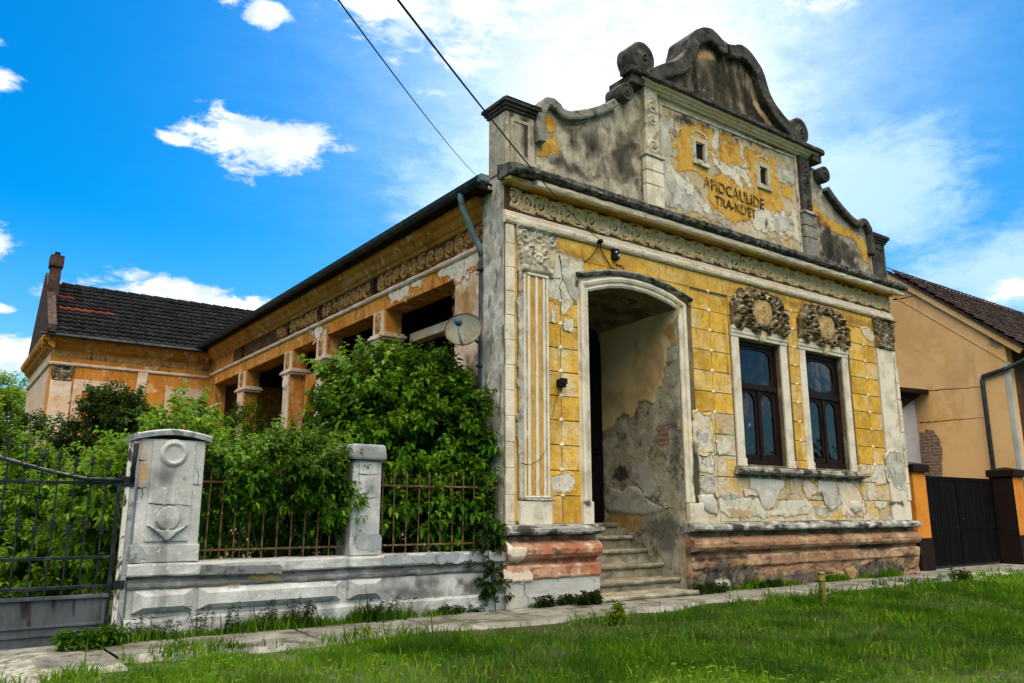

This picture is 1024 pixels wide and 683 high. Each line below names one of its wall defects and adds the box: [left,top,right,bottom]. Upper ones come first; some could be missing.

damp [571,131,597,155]
damp [612,134,636,178]
flaking render [658,114,734,230]
peeling [708,122,754,192]
peeling [438,244,479,285]
flaking render [747,206,803,244]
damp [817,218,858,269]
peeling [387,277,425,307]
peeling [550,471,578,500]
flaking render [692,409,907,519]
flaking render [920,430,943,477]
flaking render [502,541,533,587]